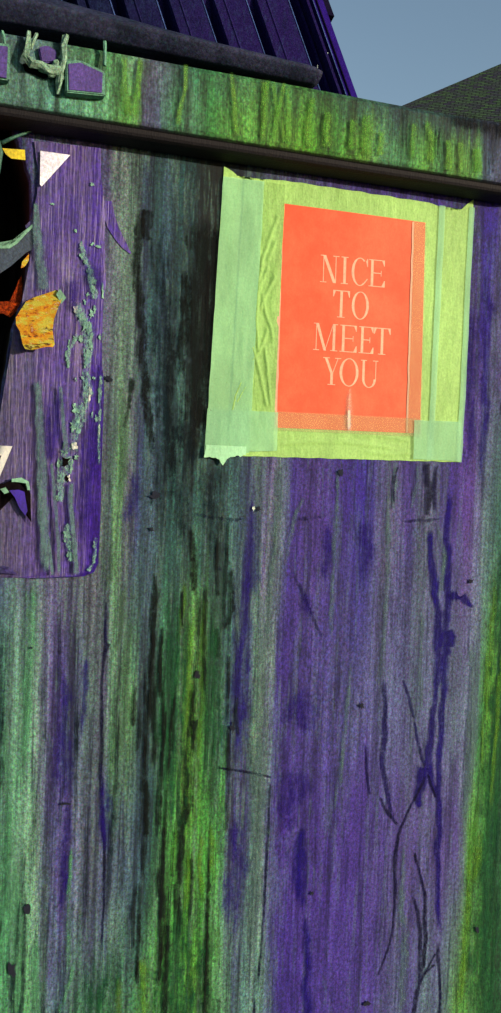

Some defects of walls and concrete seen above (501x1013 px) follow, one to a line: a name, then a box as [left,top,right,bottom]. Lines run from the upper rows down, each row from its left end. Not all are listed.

peeling [56,229,113,502]
peeling [63,524,73,561]
crack [365,499,472,1013]